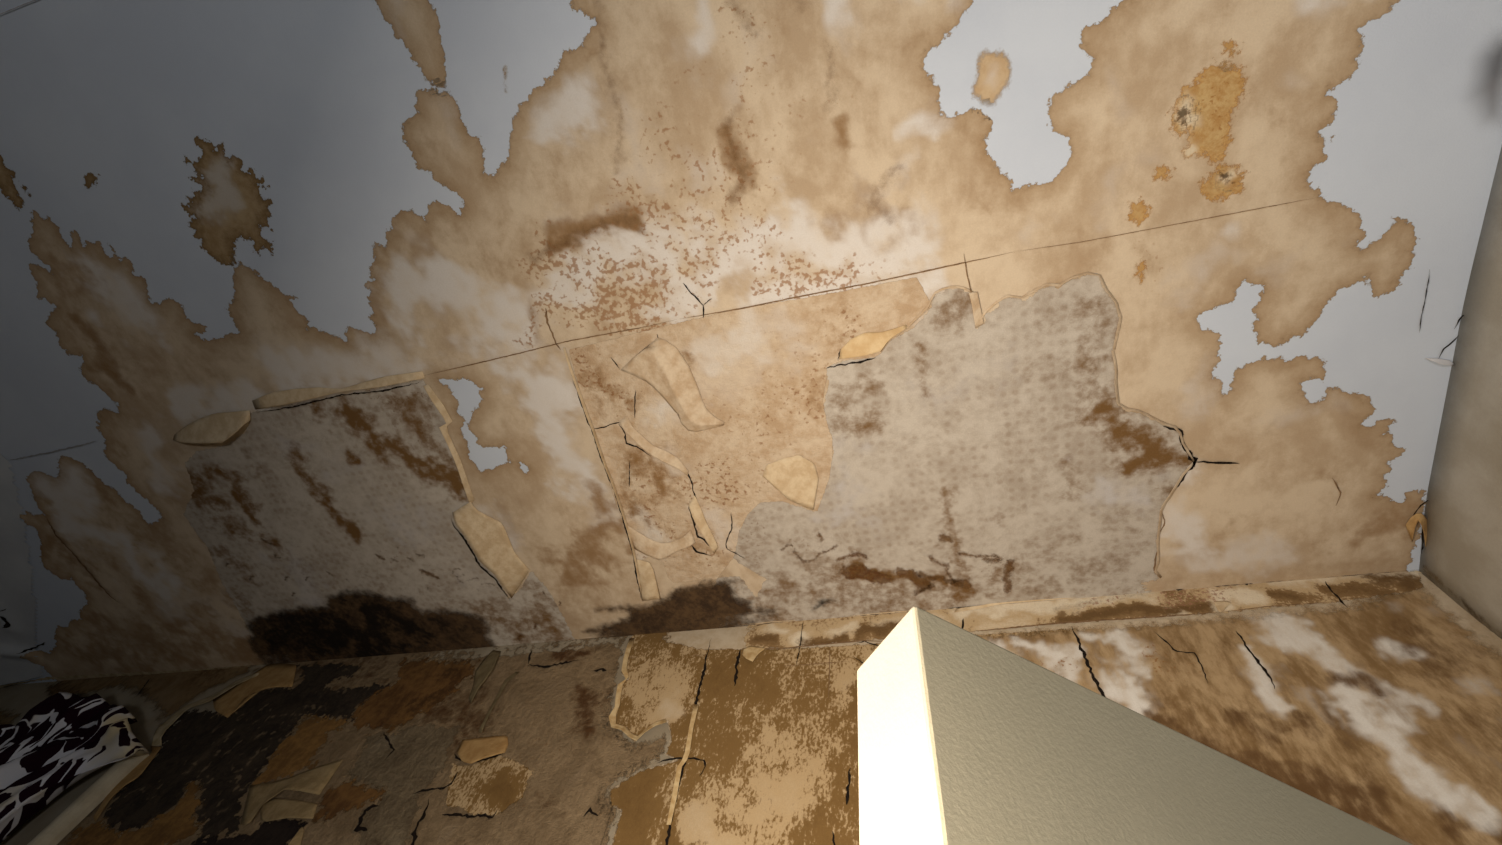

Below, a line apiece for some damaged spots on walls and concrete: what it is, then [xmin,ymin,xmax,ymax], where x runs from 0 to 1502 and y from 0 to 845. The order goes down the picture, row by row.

leakage [0,155,31,210]
leakage [19,0,1427,719]
peeling [716,272,1194,626]
peeling [57,371,666,845]
leakage [252,657,475,785]
leakage [586,557,881,845]
crack [694,621,784,705]
peeling [742,646,765,662]
crack [1072,628,1105,697]
leakage [975,577,1502,845]
crack [1237,633,1275,689]
crack [658,750,706,845]